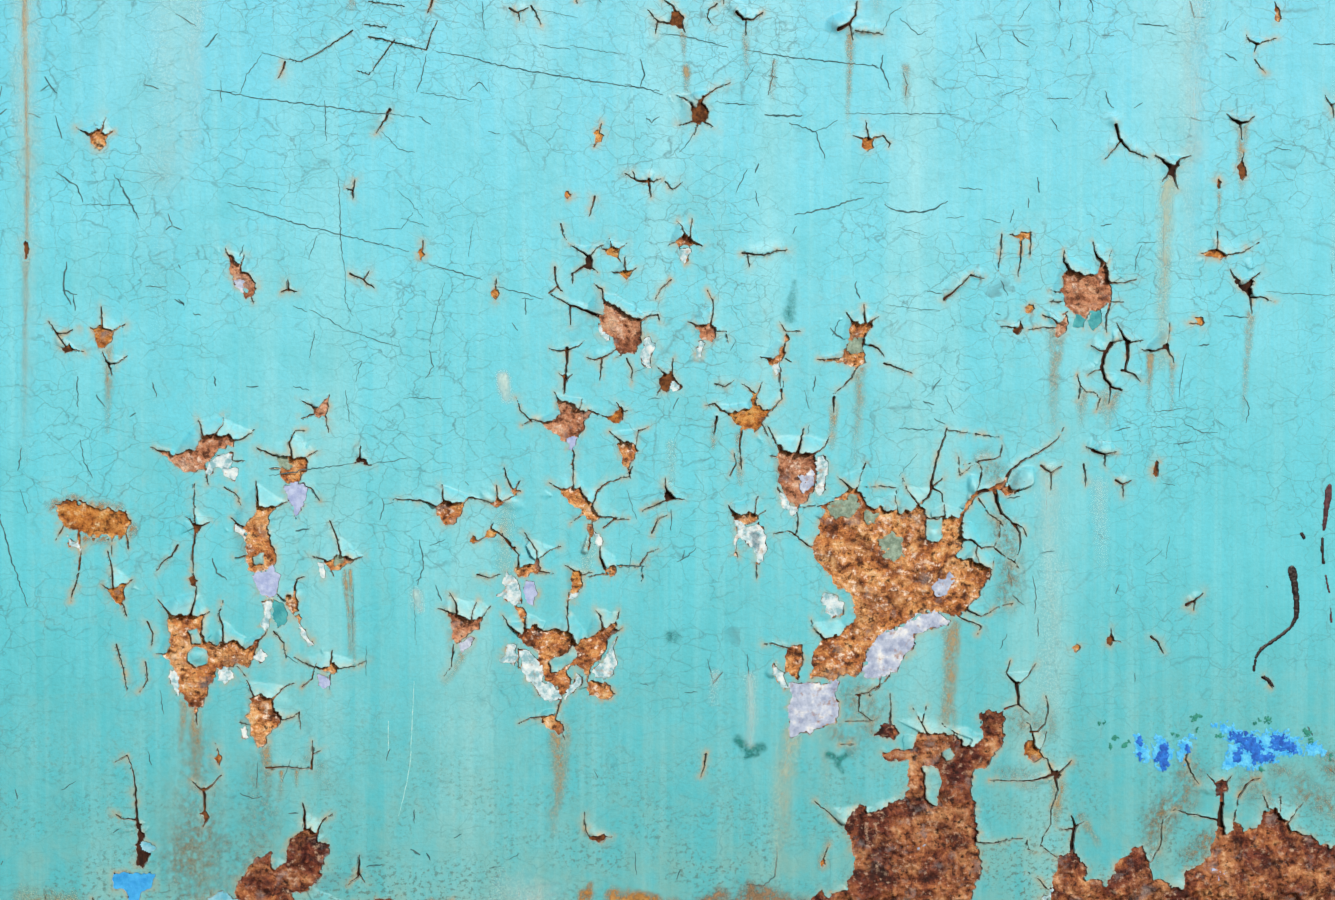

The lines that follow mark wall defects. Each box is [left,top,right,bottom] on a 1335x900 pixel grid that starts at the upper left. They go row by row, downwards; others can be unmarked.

crack [207,0,959,159]
crack [228,179,635,532]
crack [551,343,682,409]
peeling [1036,246,1132,337]
corrosion [53,496,135,595]
peeling [156,433,361,747]
peeling [441,394,643,735]
peeling [709,325,1063,738]
crack [112,752,156,900]
corrosion [208,803,336,900]
corrosion [811,623,1029,900]
corrosion [1038,774,1335,900]